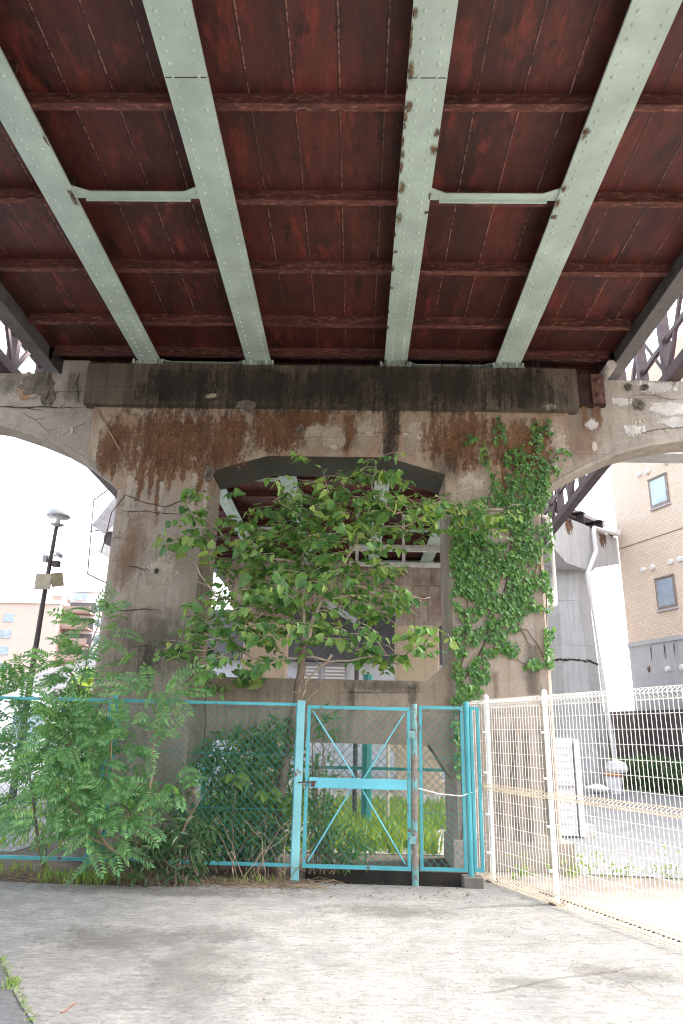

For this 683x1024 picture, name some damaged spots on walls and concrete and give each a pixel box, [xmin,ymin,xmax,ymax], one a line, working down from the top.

rust [394,62,414,237]
spalling [18,370,58,407]
crack [0,372,87,440]
rust [96,408,356,524]
damp [126,360,568,459]
rust [422,411,555,494]
peeling [585,418,598,452]
peeling [608,380,683,437]
crack [553,657,598,665]